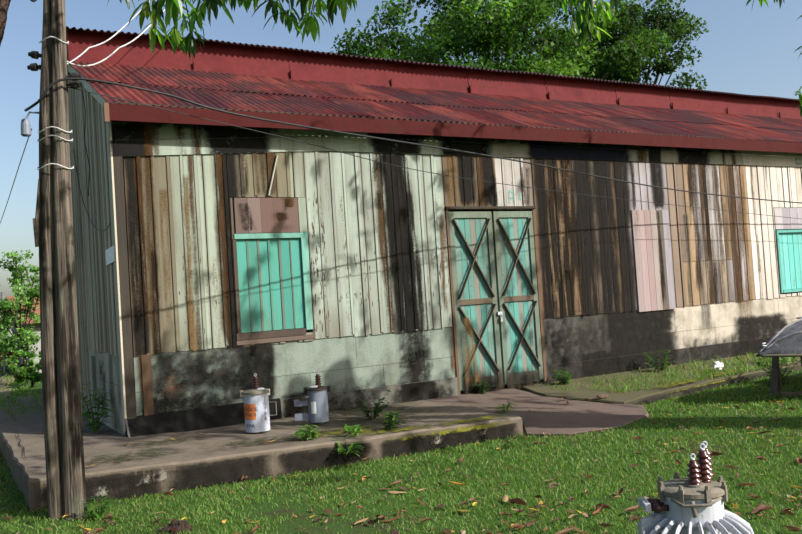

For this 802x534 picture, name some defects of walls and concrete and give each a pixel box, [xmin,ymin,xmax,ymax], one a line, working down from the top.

water stain [110,121,308,418]
water stain [328,384,376,412]
water stain [368,133,787,405]